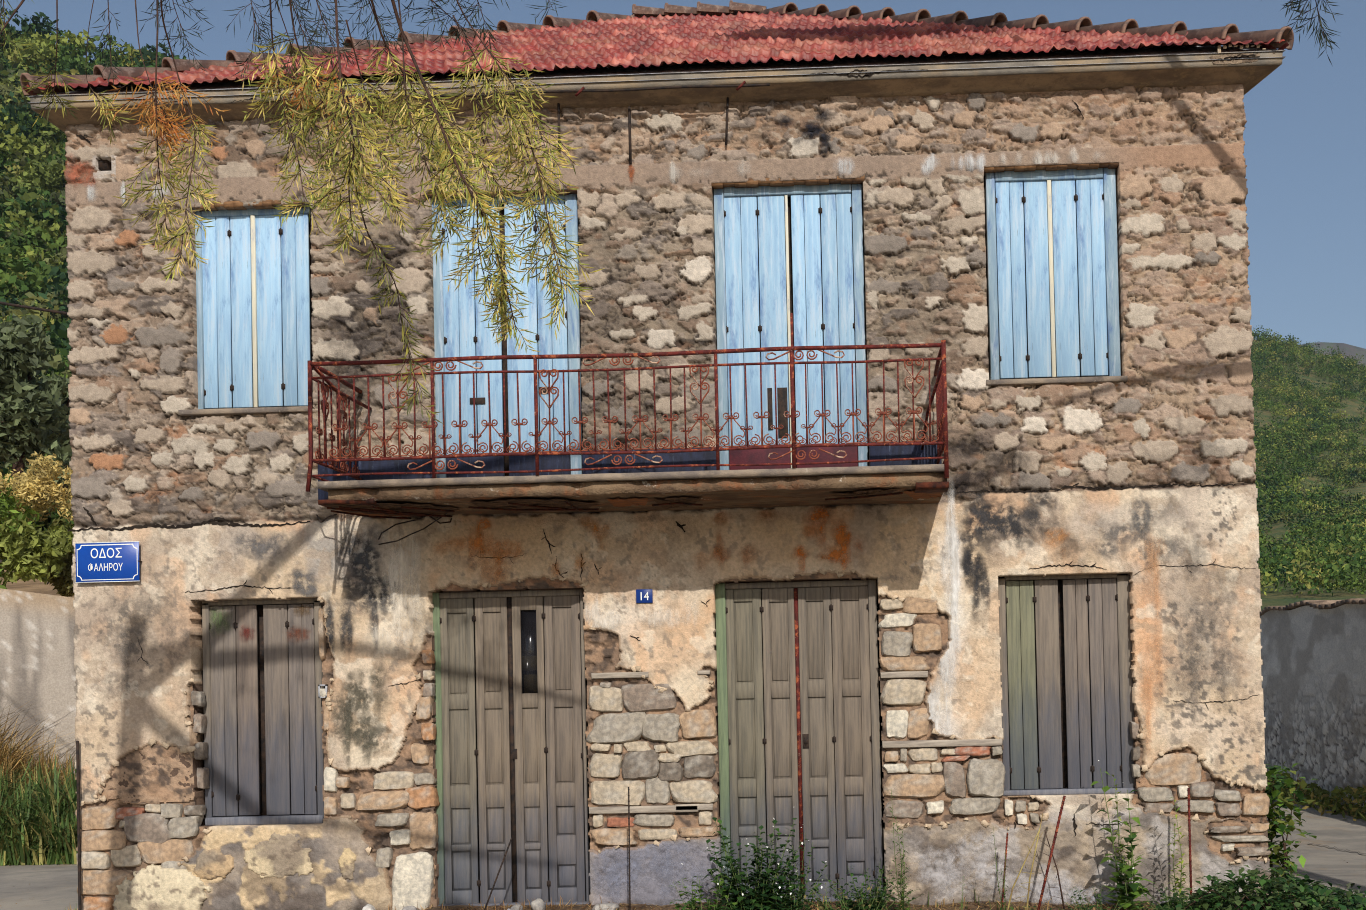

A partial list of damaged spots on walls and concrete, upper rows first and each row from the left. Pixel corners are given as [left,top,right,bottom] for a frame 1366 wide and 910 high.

crack [185,580,300,594]
corrosion [797,508,860,567]
crack [1029,561,1103,569]
crack [1135,559,1256,575]
leakage [326,606,352,645]
leakage [344,702,369,758]
flaking render [317,597,440,910]
flaking render [584,627,719,854]
flaking render [878,595,1049,830]
flaking render [75,678,211,910]
flaking render [1129,713,1272,865]